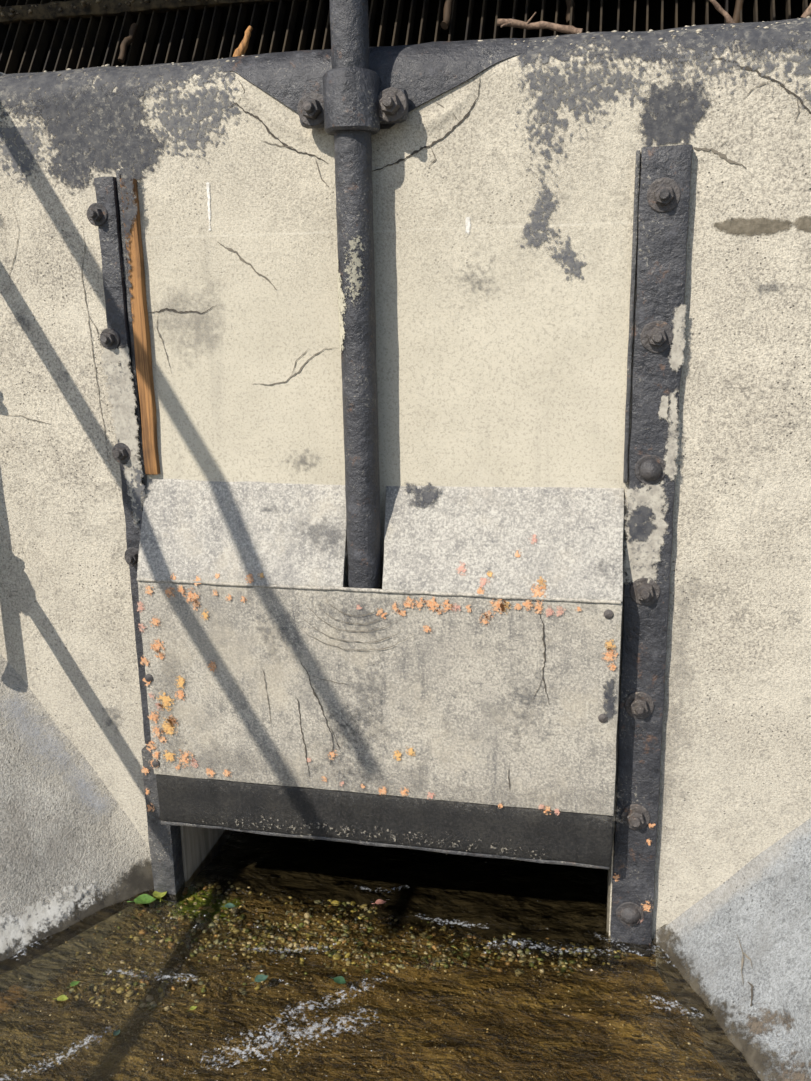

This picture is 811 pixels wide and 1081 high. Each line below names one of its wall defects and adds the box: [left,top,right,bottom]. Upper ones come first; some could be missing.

crack [712,57,811,122]
crack [373,79,480,171]
crack [218,242,277,290]
water stain [548,234,587,280]
water stain [714,216,811,236]
crack [258,348,332,386]
peeling [627,506,657,542]
crack [296,663,348,777]
water stain [0,860,154,975]
water stain [652,925,788,1081]